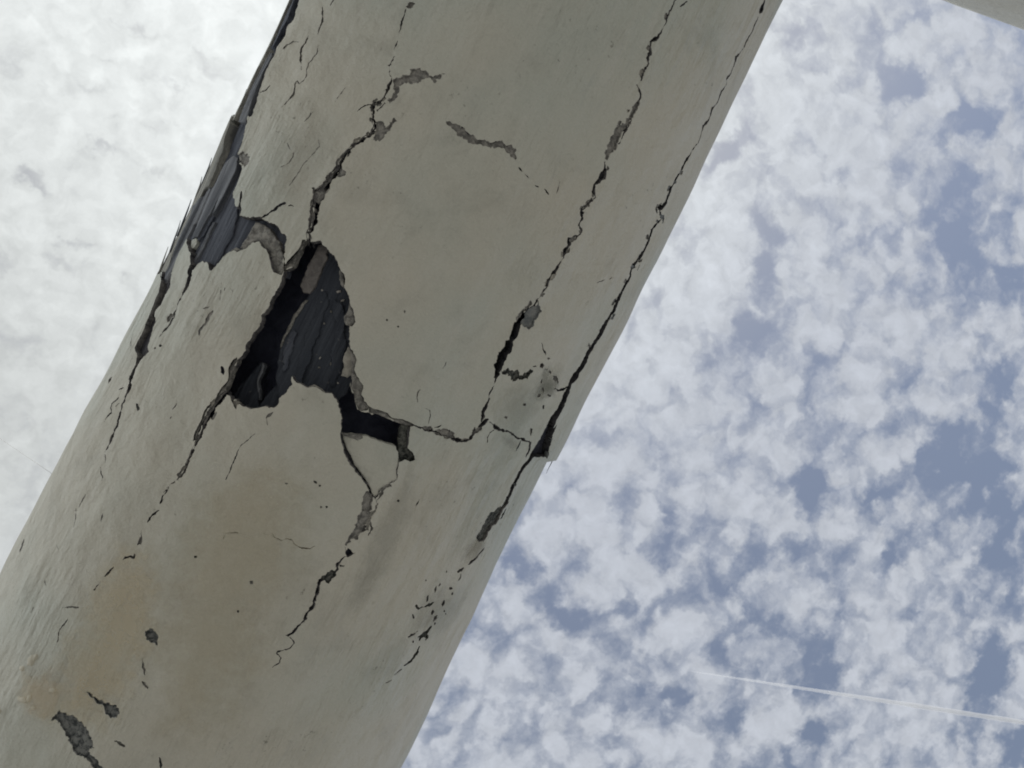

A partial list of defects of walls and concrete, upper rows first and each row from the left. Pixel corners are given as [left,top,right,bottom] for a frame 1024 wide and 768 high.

flaking render [157,0,415,499]
crack [260,0,445,249]
flaking render [446,121,560,195]
crack [413,0,765,502]
flaking render [51,710,103,768]
crack [57,386,232,642]
flaking render [145,628,158,646]
crack [74,265,233,524]
crack [225,412,273,480]
crack [272,435,392,668]